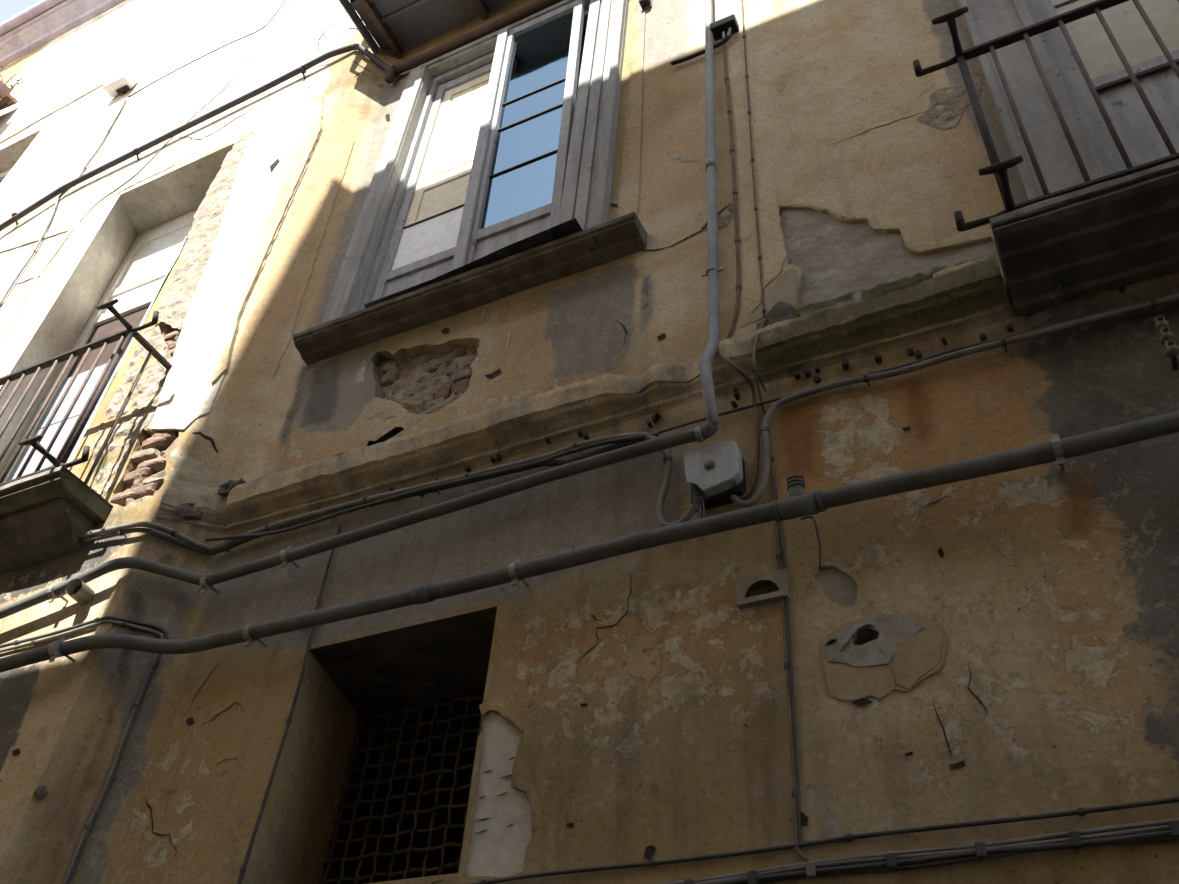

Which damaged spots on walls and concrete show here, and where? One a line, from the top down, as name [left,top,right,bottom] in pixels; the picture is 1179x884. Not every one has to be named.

spalling [728,170,1004,338]
spalling [92,130,255,521]
spalling [354,328,501,414]
spalling [367,427,405,446]
spalling [851,628,879,645]
spalling [851,698,873,706]
crack [144,793,185,860]
spalling [463,703,540,878]